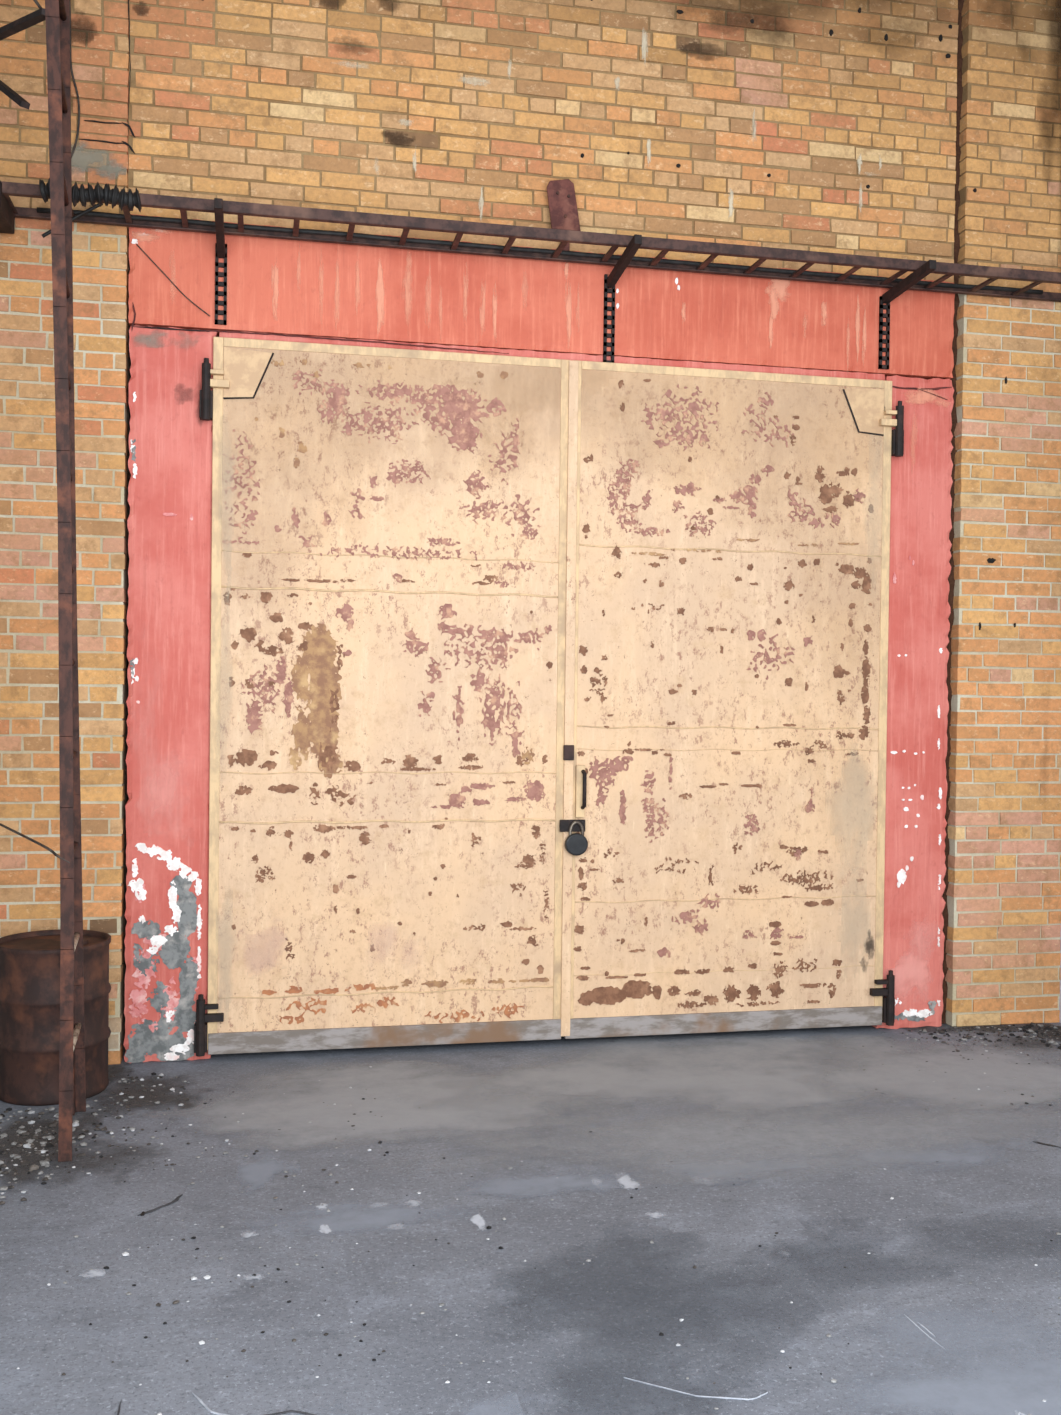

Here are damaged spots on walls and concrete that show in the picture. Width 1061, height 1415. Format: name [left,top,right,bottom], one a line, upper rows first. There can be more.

water stain [683,45,715,55]
water stain [1052,0,1061,115]
peeling [271,359,541,540]
peeling [274,506,535,588]
peeling [607,459,874,763]
peeling [223,578,361,807]
peeling [381,603,553,830]
peeling [231,824,389,864]
peeling [577,741,762,843]
peeling [655,844,834,936]
peeling [125,843,203,1063]
peeling [573,921,842,1009]